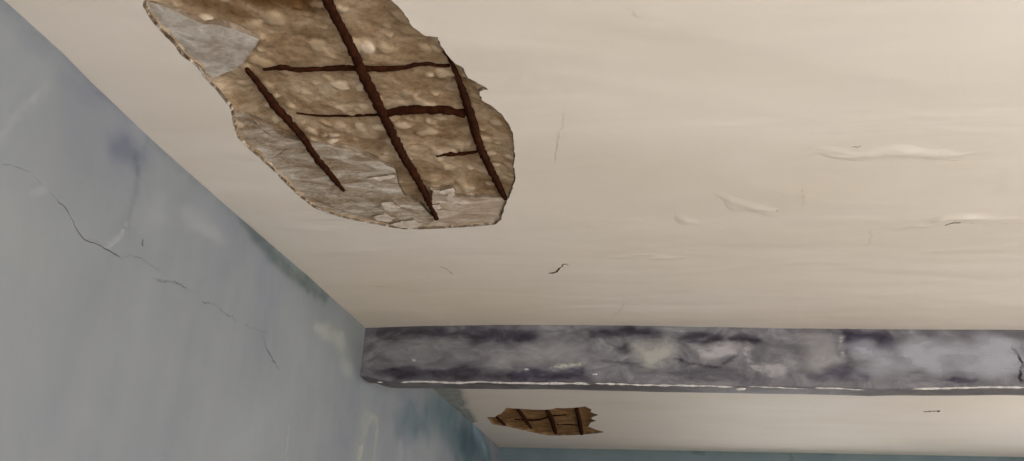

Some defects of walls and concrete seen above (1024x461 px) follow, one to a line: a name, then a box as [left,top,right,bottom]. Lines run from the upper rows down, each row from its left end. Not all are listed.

spalling [143,0,516,230]
crack [56,199,121,259]
spalling [487,406,603,436]